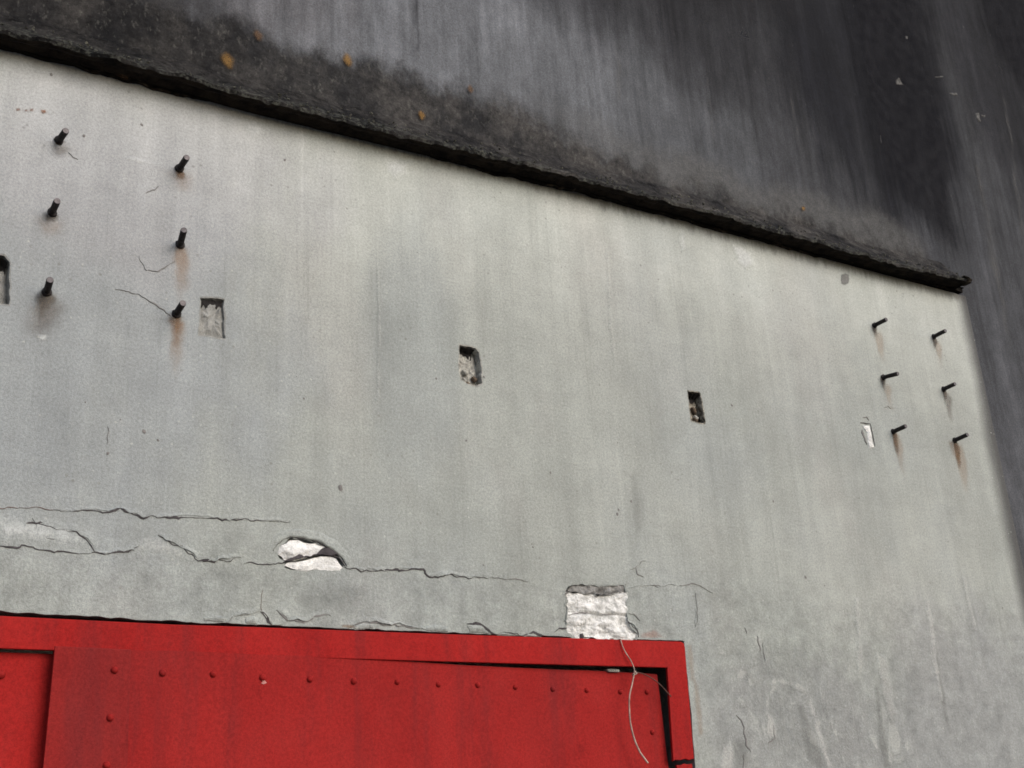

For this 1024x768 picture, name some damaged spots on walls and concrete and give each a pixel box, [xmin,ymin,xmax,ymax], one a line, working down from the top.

damp [245,120,270,140]
damp [854,0,954,235]
damp [380,157,410,182]
damp [730,241,755,271]
crack [115,259,174,314]
crack [0,505,290,565]
crack [345,564,527,582]